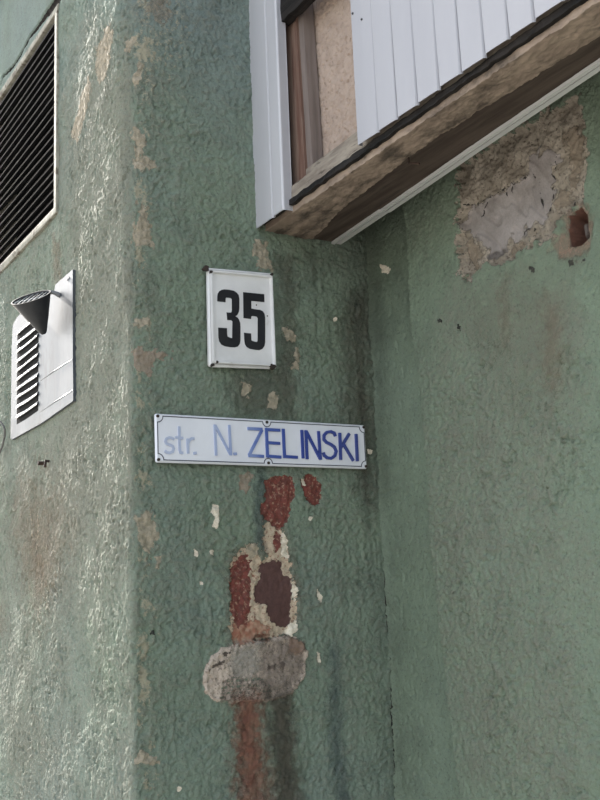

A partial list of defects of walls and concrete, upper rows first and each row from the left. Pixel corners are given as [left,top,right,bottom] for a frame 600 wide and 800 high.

crack [1,0,61,84]
peeling [71,24,114,144]
flaking render [452,93,593,283]
peeling [202,471,322,704]